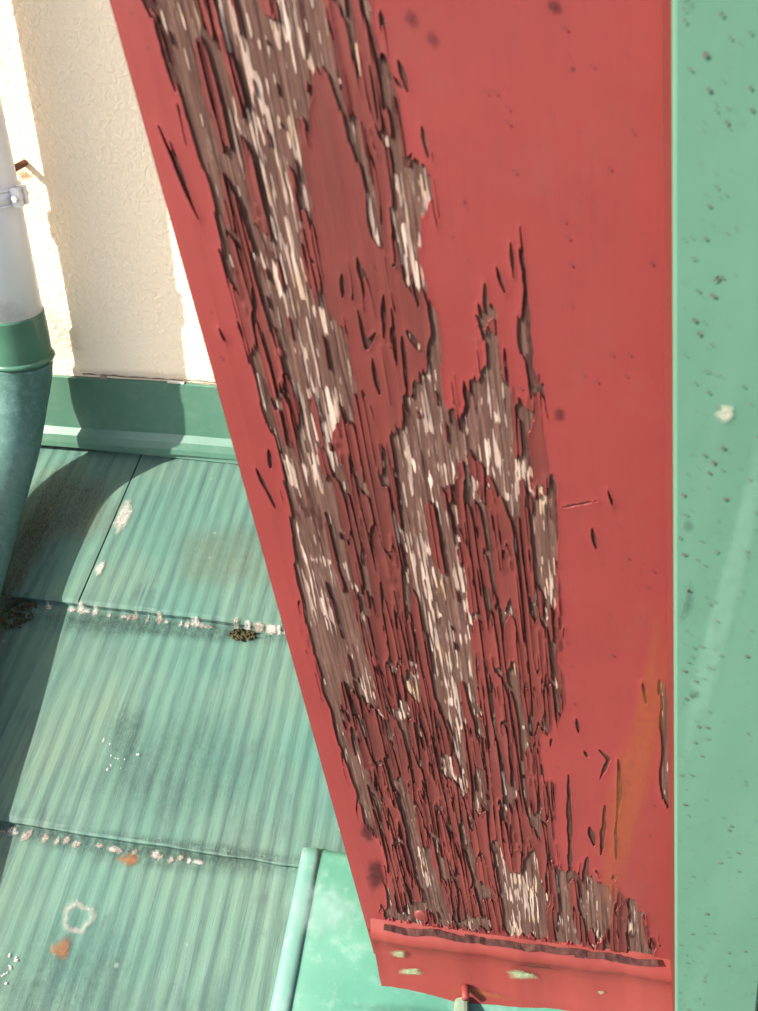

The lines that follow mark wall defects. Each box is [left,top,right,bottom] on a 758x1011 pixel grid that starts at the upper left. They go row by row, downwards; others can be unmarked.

peeling [143,0,661,955]
peeling [657,680,668,807]